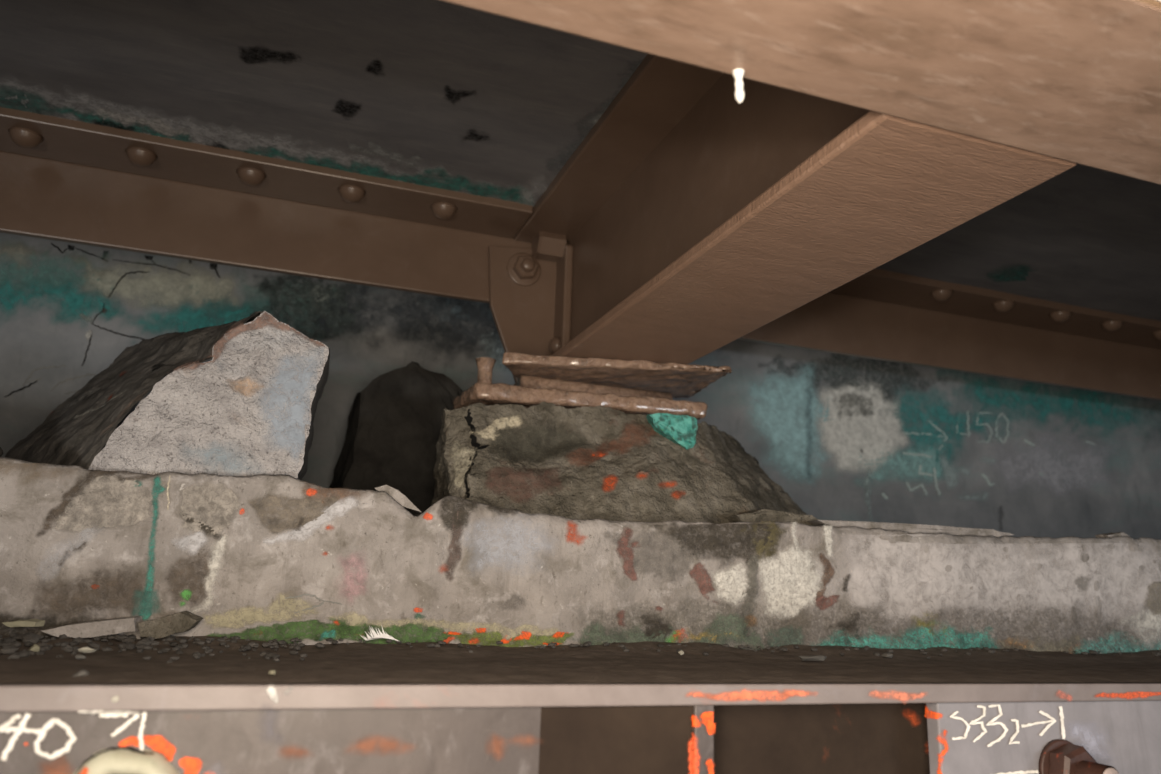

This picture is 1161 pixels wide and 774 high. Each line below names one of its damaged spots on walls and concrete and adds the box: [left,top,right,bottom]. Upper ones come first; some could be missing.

crack [51,243,220,366]
crack [5,381,37,397]
crack [464,409,489,498]
water stain [751,367,829,477]
water stain [865,377,1134,513]